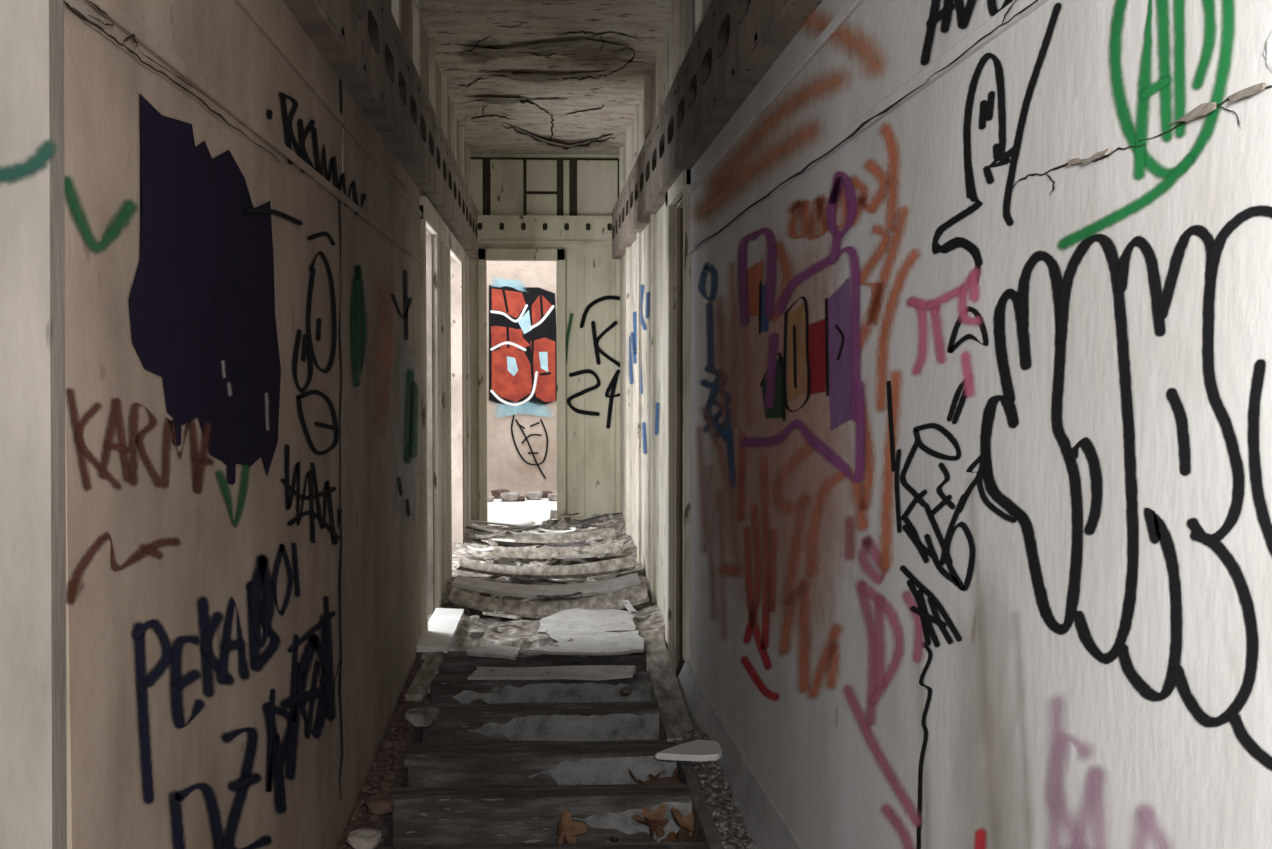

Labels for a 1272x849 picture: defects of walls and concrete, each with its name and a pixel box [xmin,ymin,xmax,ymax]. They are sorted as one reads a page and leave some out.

flaking render [1263,31,1272,73]
crack [1009,83,1272,194]